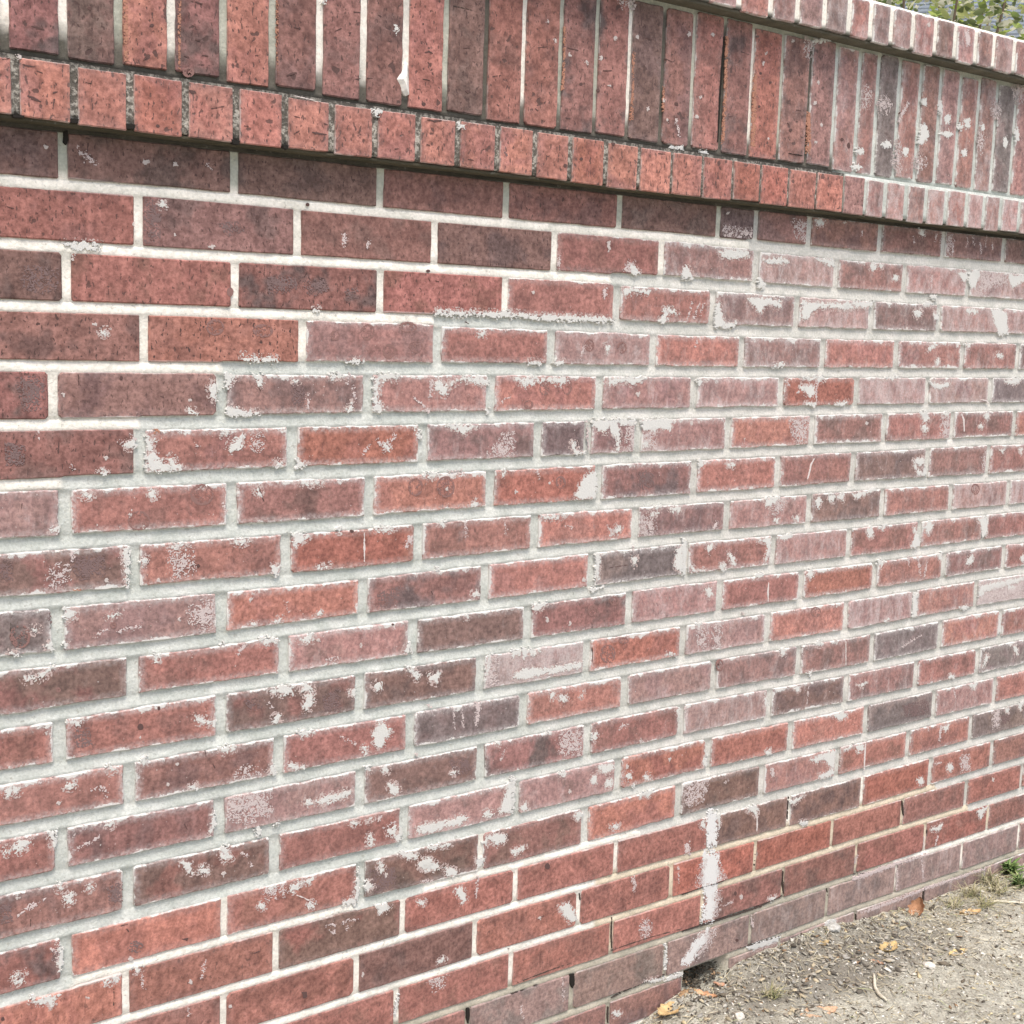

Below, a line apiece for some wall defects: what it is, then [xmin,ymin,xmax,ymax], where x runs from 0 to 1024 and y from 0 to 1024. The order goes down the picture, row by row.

water stain [452,701,482,730]
water stain [369,867,398,893]
water stain [681,808,734,966]